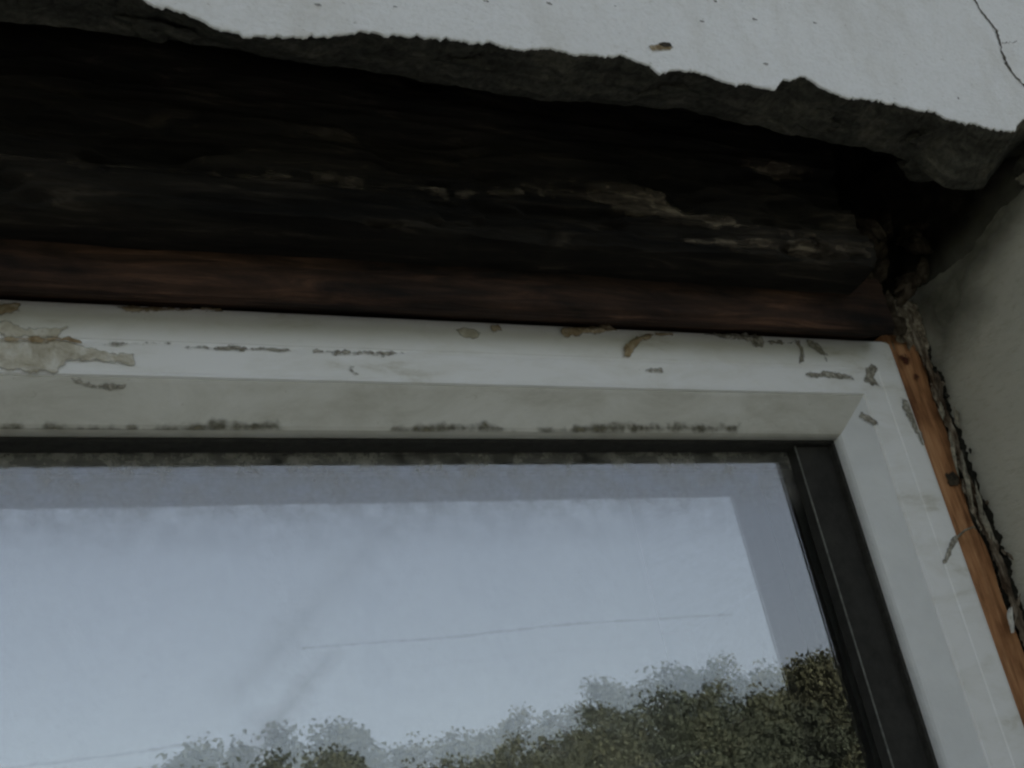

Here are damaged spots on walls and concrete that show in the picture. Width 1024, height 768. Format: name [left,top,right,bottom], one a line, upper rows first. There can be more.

crack [975,0,1024,86]
spalling [0,0,1024,341]
peeling [938,381,997,546]
peeling [1007,607,1015,633]